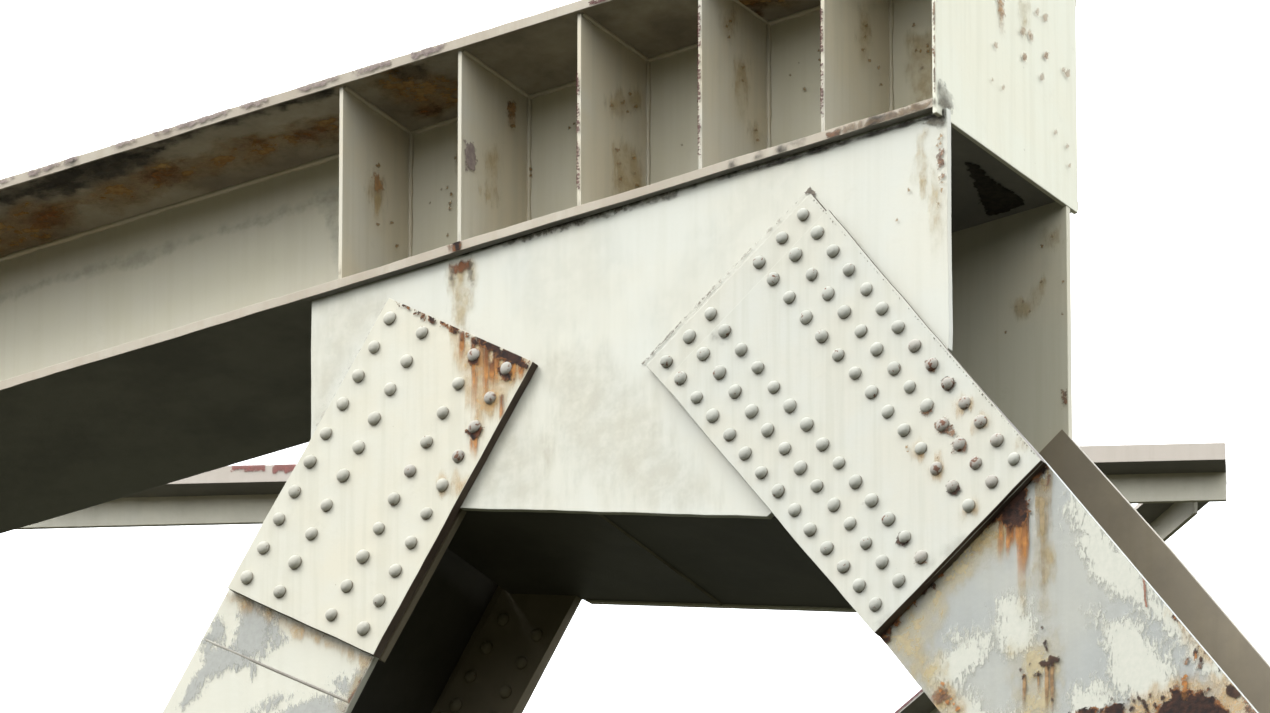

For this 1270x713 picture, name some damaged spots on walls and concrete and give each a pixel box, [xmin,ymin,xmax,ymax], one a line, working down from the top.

rust [915,1,953,109]
rust [396,302,530,451]
rust [921,404,967,458]
rust [974,464,1051,562]
peeling [180,601,288,711]
peeling [250,664,367,713]
rust [880,572,944,644]
peeling [894,590,1039,713]
rust [1019,626,1060,713]
peeling [1059,489,1257,713]
rust [1068,645,1256,713]